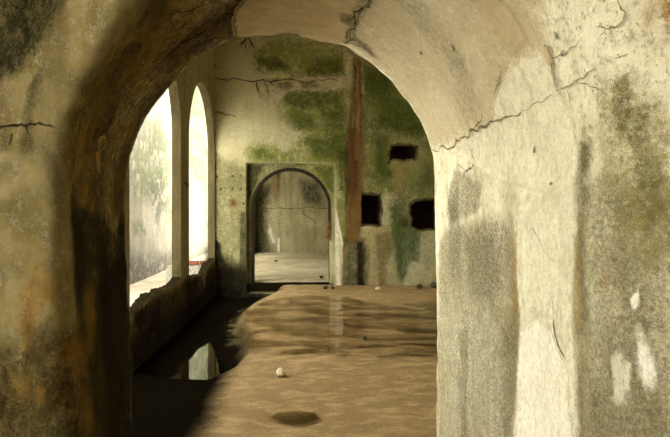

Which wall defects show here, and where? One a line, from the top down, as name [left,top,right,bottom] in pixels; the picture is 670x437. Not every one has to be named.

crack [330,0,375,66]
crack [0,122,55,145]
crack [215,63,338,97]
rust [343,59,363,242]
spalling [384,143,419,165]
crack [431,39,603,178]
water stain [613,76,663,231]
water stain [0,0,297,437]
water stain [335,209,368,285]
spalling [359,191,383,227]
water stain [376,201,420,285]
spalling [408,198,435,232]